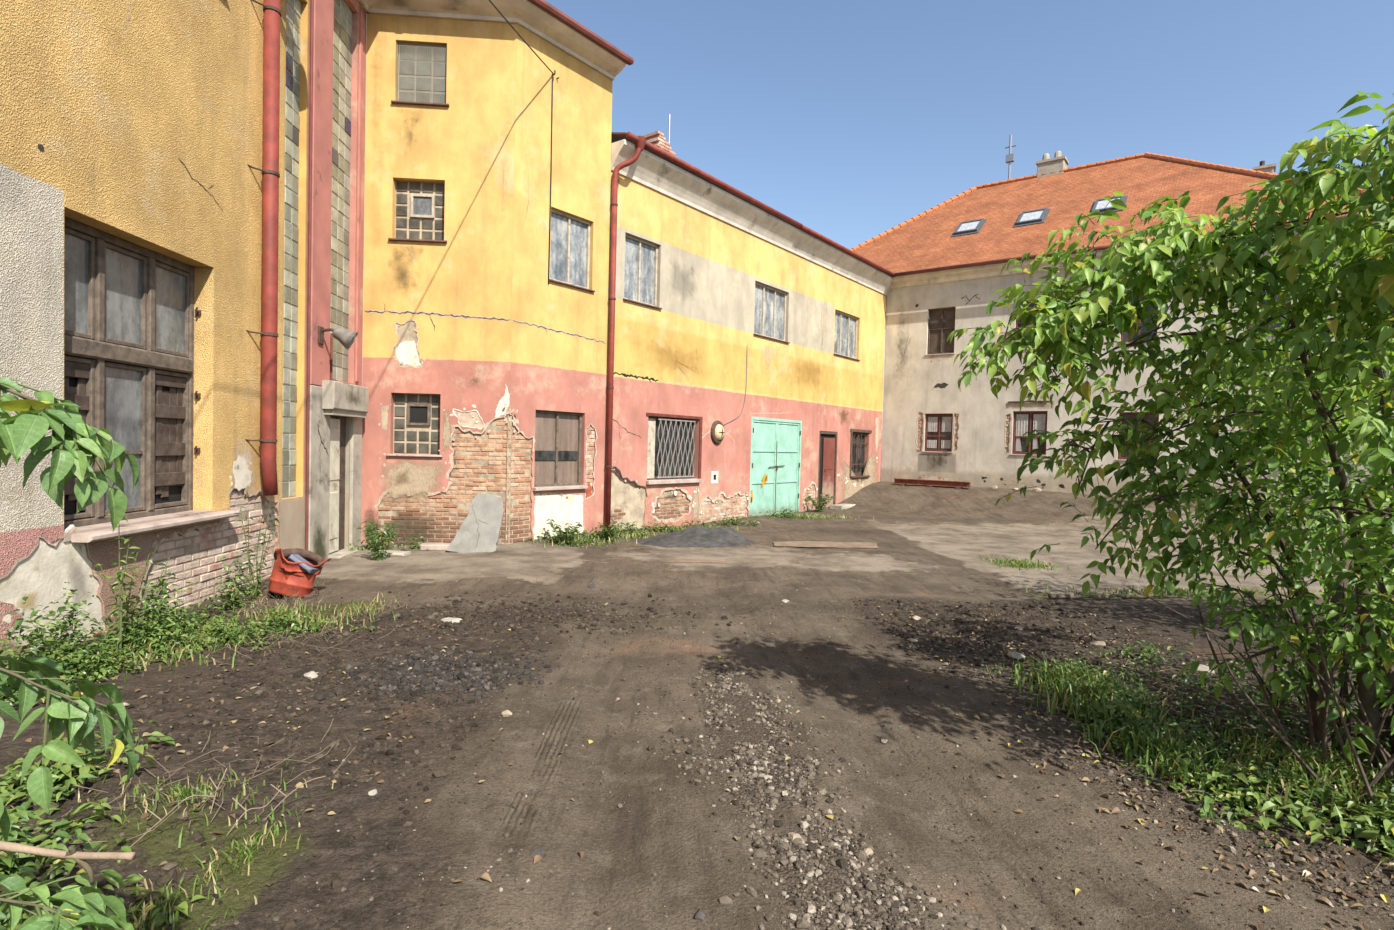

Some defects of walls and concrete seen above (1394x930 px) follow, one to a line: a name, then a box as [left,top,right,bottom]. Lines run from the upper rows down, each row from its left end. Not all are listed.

flaking render [392,318,425,368]
crack [364,304,793,442]
spalling [365,384,750,545]
flaking render [0,525,113,667]
spalling [137,452,280,620]